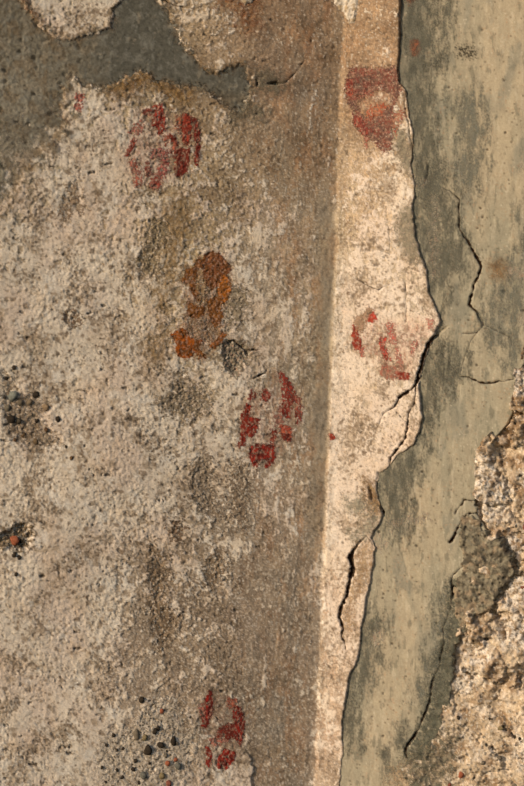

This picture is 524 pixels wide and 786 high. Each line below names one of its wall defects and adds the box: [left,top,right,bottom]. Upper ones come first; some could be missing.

flaking render [0,0,252,191]
crack [450,191,504,334]
crack [379,335,436,462]
crack [452,360,513,384]
crack [338,537,371,649]
spalling [453,512,523,631]